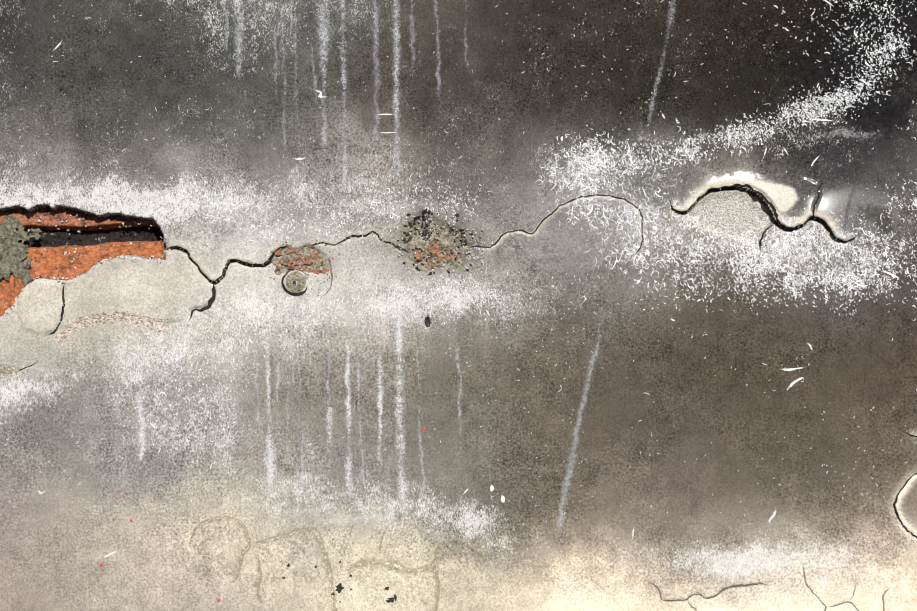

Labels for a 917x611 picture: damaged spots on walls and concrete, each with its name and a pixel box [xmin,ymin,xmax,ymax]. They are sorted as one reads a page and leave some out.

crack [48,286,65,335]
spalling [0,201,171,319]
crack [165,246,287,320]
leakage [96,166,541,485]
crack [311,231,410,253]
crack [473,194,644,255]
flaking render [689,179,798,249]
crack [669,181,857,253]
crack [893,473,917,538]